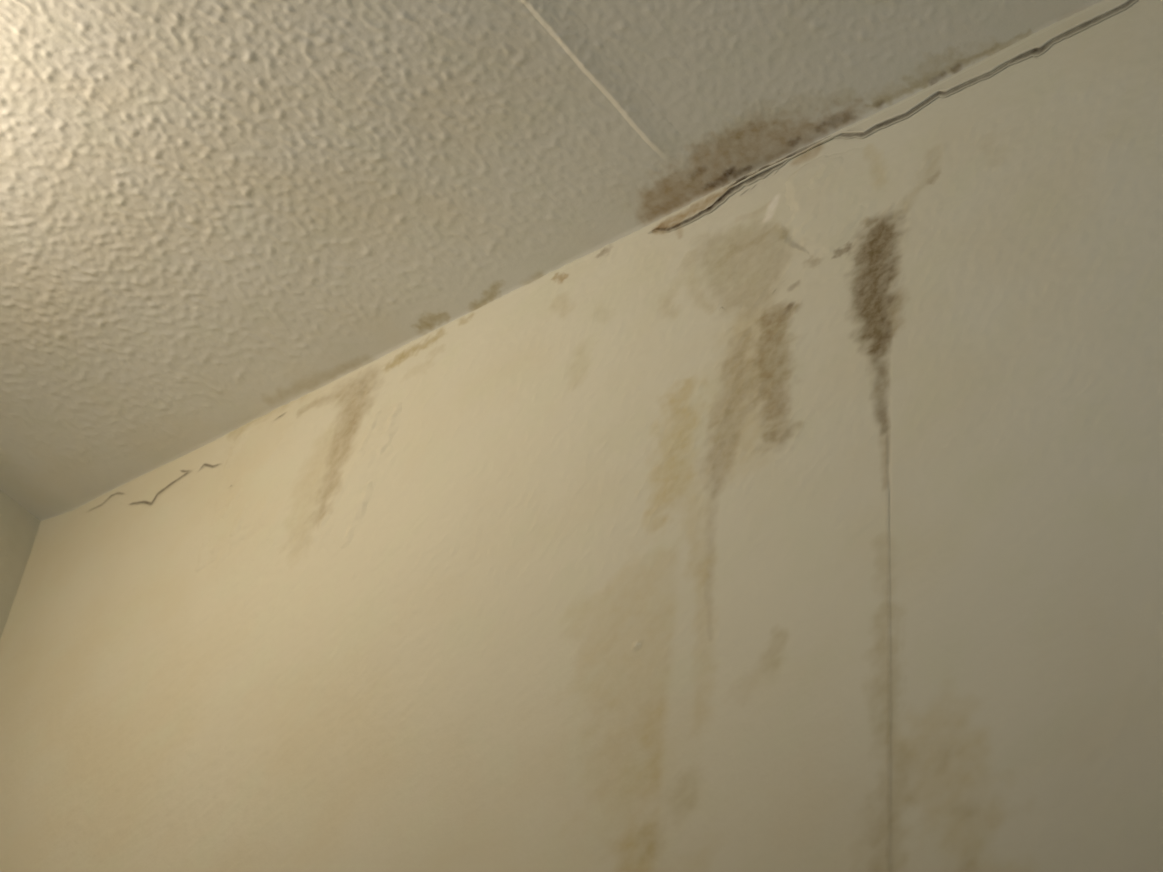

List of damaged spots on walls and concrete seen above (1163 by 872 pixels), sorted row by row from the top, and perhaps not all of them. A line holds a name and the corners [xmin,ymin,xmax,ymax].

crack [648,0,1137,233]
crack [87,463,222,512]
damp [224,268,578,573]
damp [547,142,951,872]